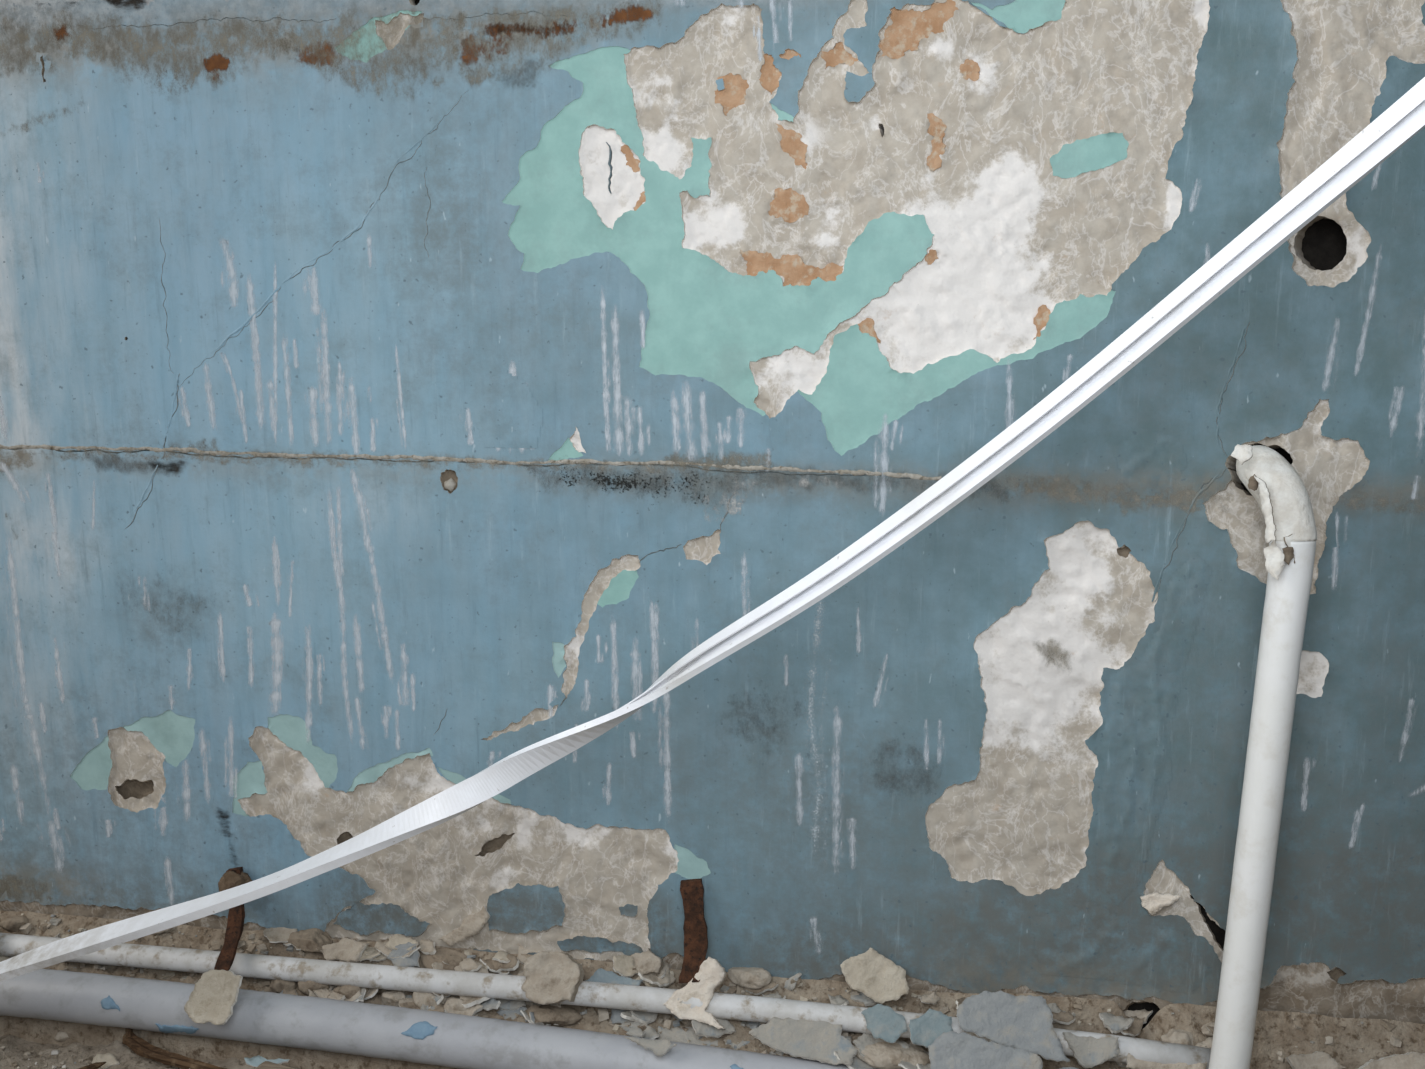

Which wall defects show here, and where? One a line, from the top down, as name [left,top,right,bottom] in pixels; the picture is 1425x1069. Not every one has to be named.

corrosion [204,54,229,76]
corrosion [296,41,335,66]
corrosion [461,21,576,65]
corrosion [602,5,652,27]
spalling [1279,0,1425,197]
crack [0,89,941,528]
peeling [502,0,1210,461]
spalling [1289,193,1371,287]
spalling [1243,400,1370,594]
peeling [232,714,466,857]
peeling [926,521,1158,896]
peeling [182,794,711,988]